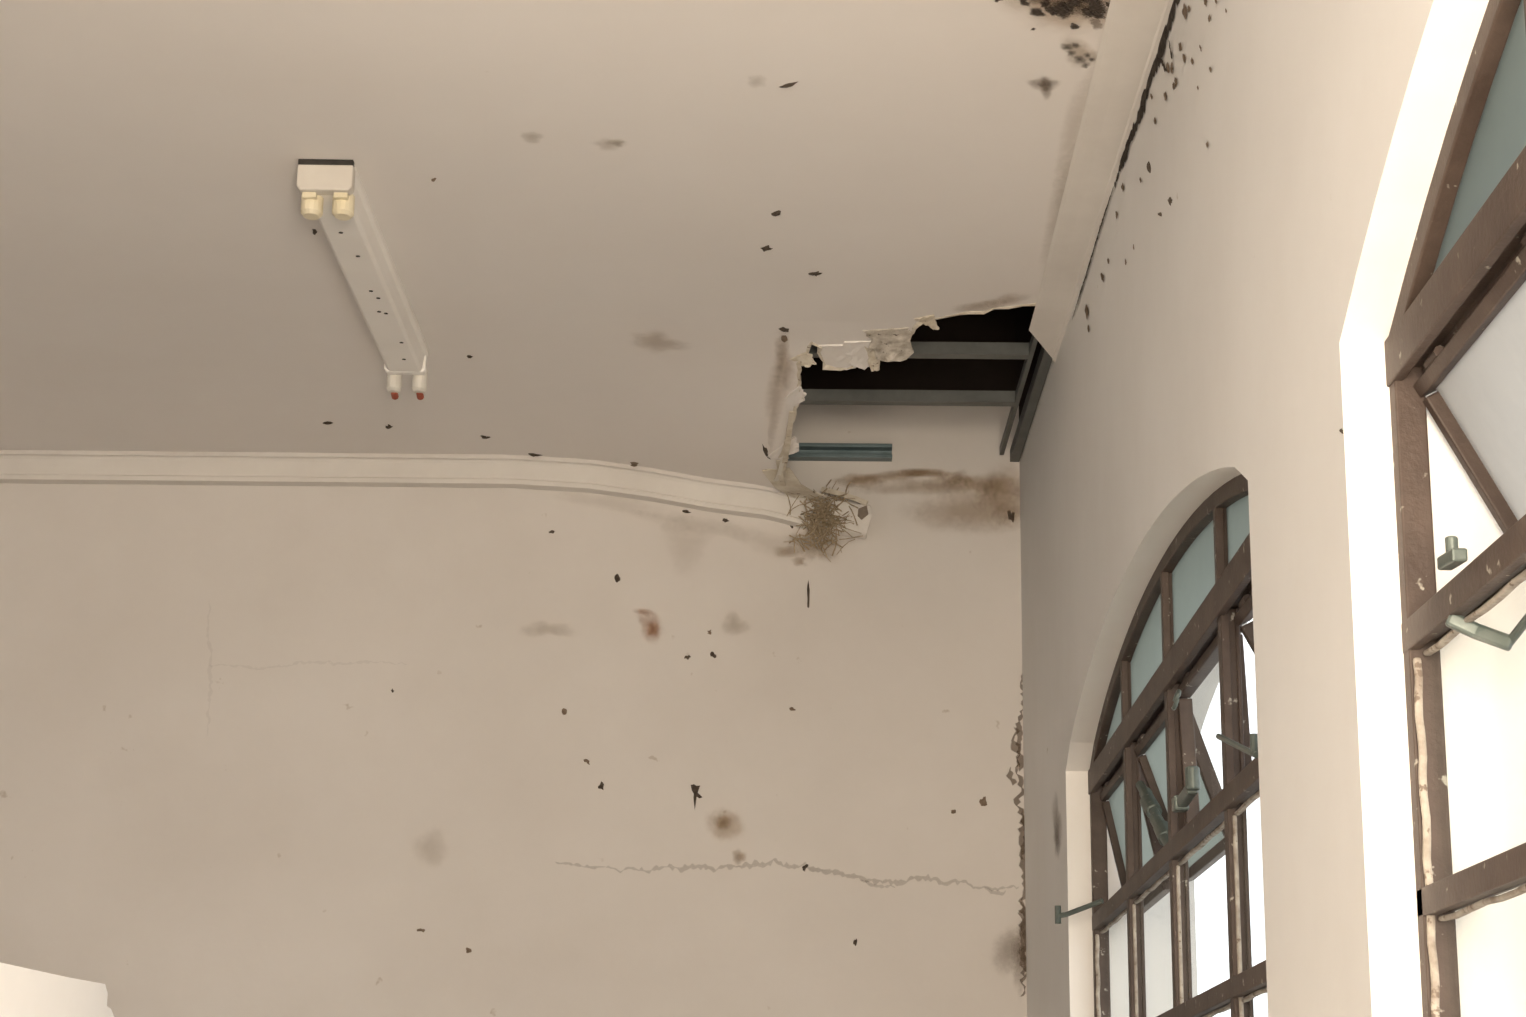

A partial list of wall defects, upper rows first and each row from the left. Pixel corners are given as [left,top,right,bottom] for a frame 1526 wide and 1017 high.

water stain [1020,0,1110,67]
crack [1072,0,1227,332]
crack [1007,675,1027,996]